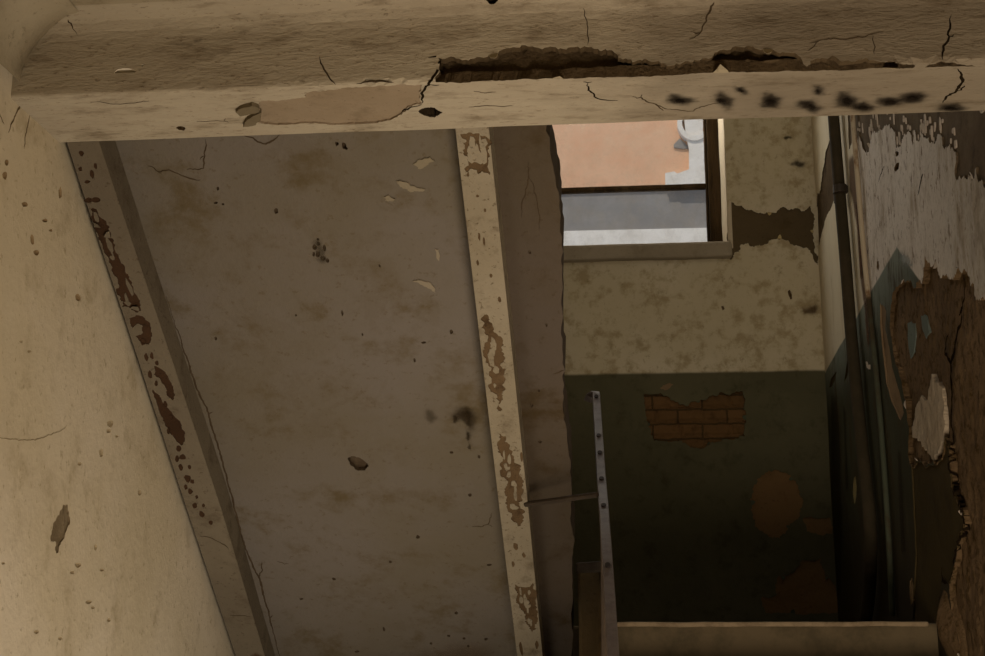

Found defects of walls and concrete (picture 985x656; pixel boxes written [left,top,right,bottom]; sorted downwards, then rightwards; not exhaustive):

peeling [236,84,422,127]
crack [402,56,443,112]
peeling [460,132,492,177]
flaking render [435,45,973,83]
flaking render [848,111,985,188]
flaking render [727,141,834,264]
peeling [84,197,213,525]
peeling [481,314,506,411]
peeling [497,434,525,526]
flaking render [880,257,985,656]